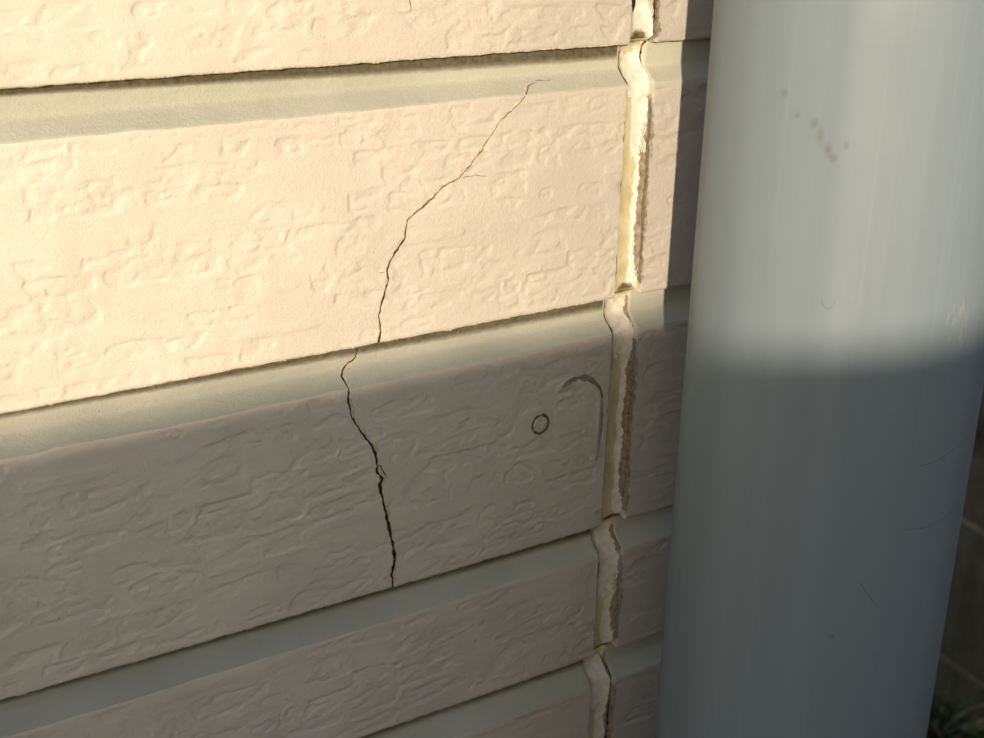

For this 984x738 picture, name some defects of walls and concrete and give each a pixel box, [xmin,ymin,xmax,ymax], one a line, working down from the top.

peeling [0,0,654,738]
crack [341,80,550,587]